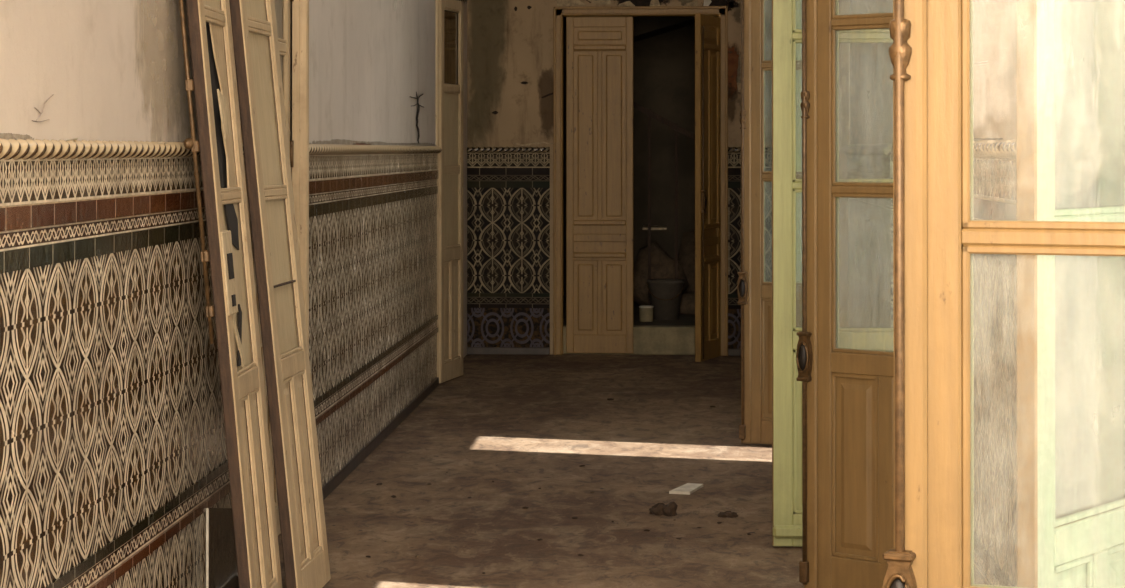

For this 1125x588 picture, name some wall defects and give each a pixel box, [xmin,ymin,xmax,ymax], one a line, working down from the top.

spalling [557,0,735,11]
leakage [539,71,553,137]